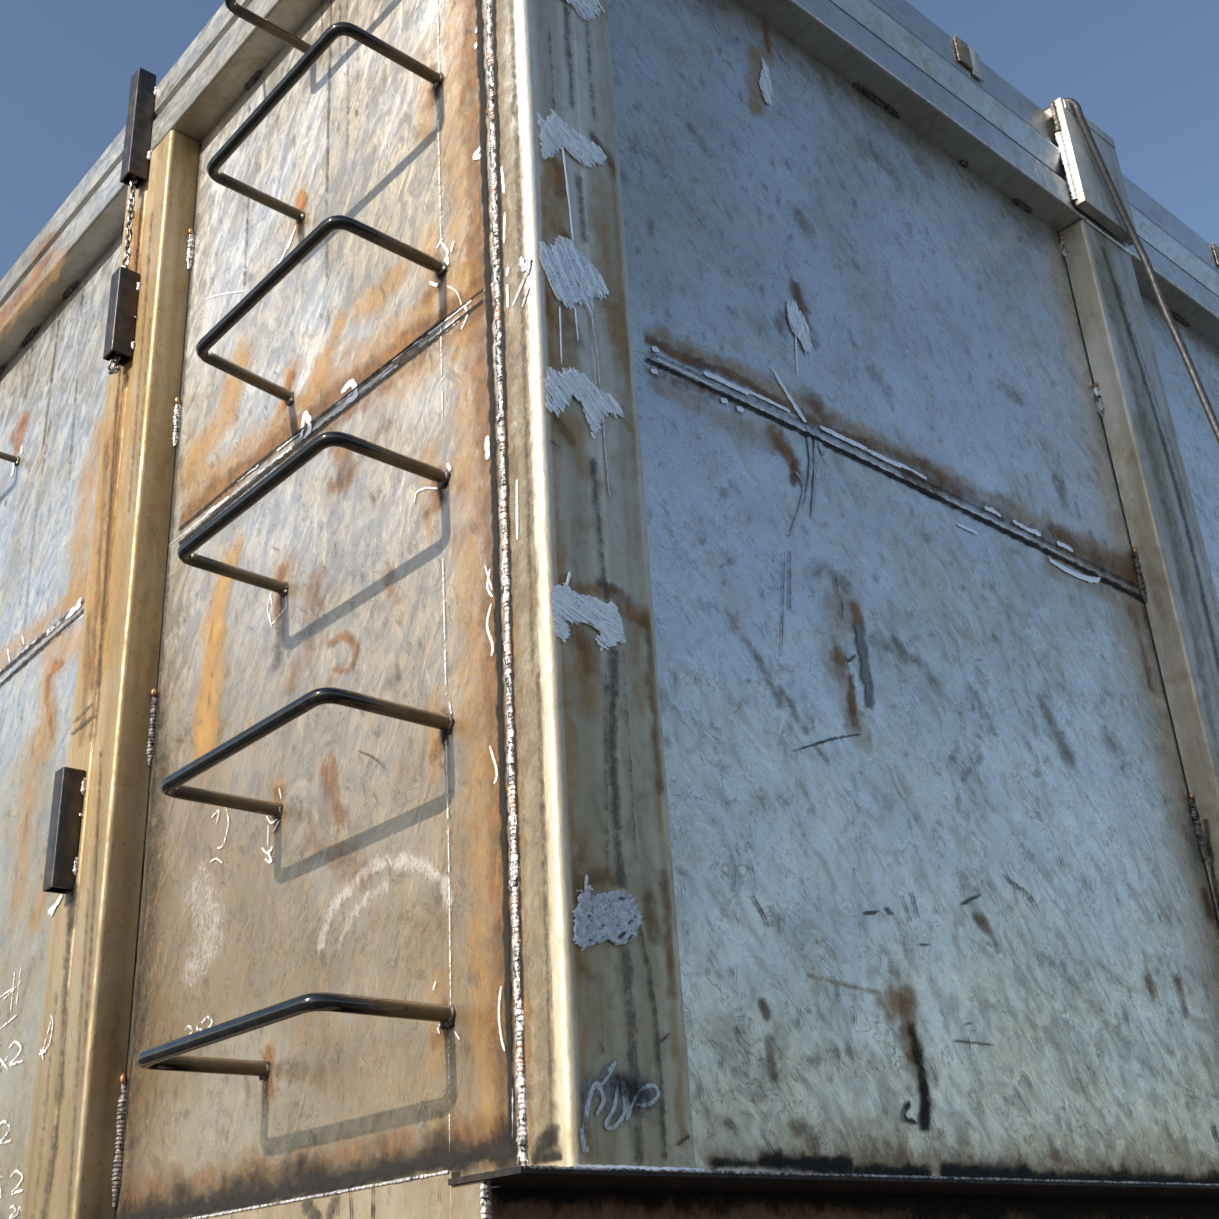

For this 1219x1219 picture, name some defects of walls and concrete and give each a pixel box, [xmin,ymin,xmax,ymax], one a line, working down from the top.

rust [541,155,569,244]
rust [590,133,616,178]
rust [545,274,573,376]
rust [791,280,813,340]
rust [180,276,485,524]
rust [646,331,1138,584]
rust [195,546,239,757]
rust [272,566,284,668]
rust [557,537,664,834]
rust [835,647,858,726]
rust [851,602,919,663]
rust [564,699,594,926]